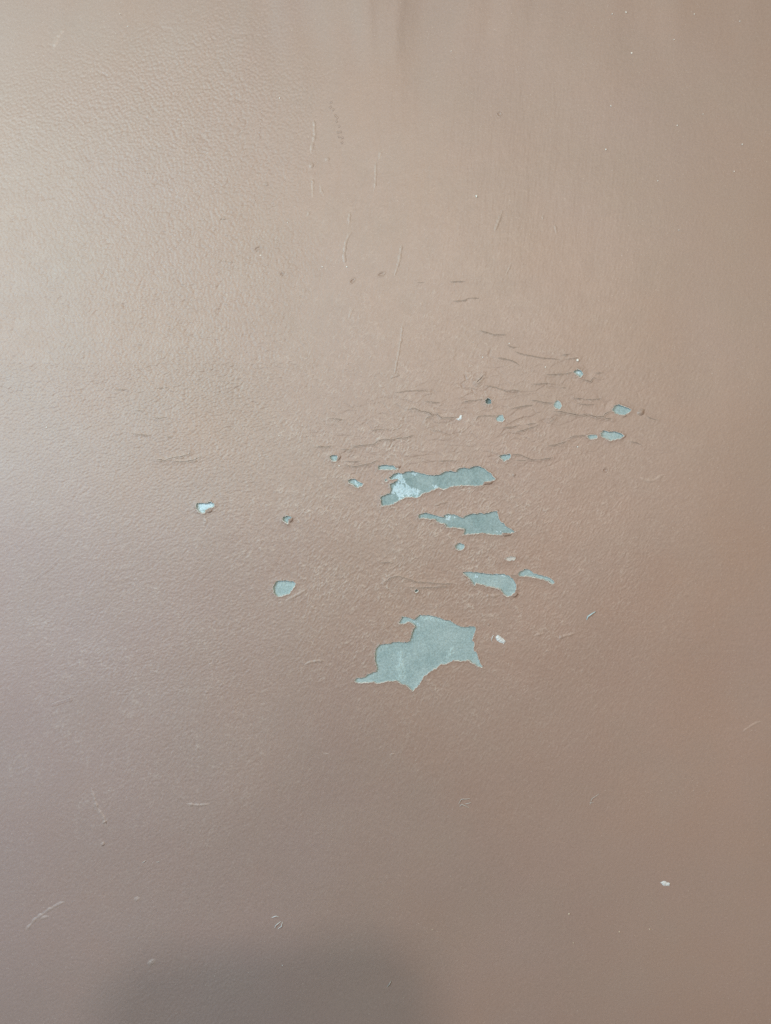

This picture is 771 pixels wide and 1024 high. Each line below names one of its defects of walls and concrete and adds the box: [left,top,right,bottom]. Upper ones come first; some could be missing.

peeling [585,429,626,443]
peeling [376,463,497,508]
peeling [194,500,216,515]
peeling [417,509,517,552]
peeling [271,579,298,599]
peeling [462,554,556,598]
peeling [353,613,484,693]